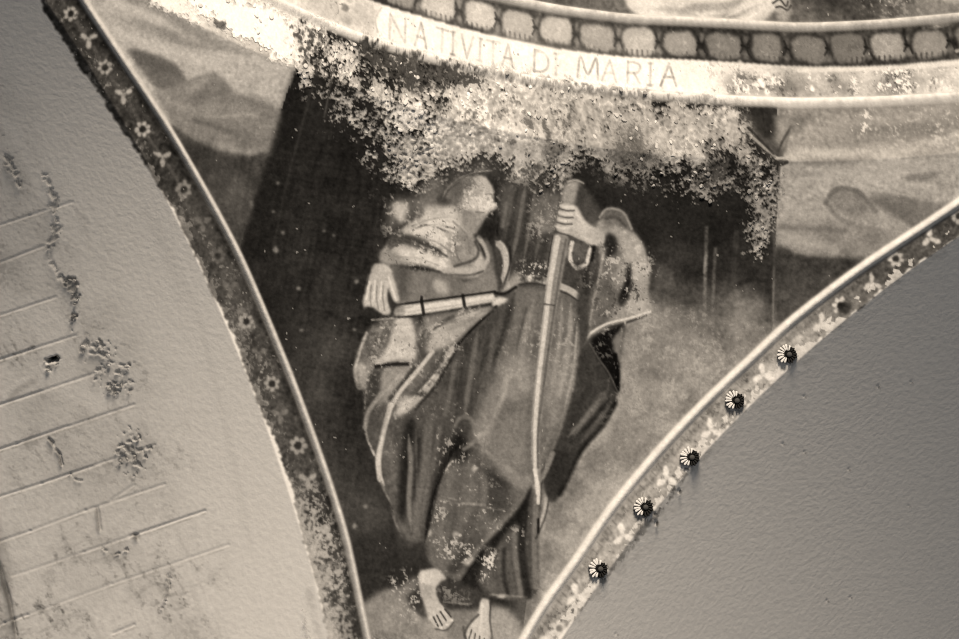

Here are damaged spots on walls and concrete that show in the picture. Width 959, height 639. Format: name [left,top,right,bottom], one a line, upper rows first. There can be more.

peeling [149,0,785,259]